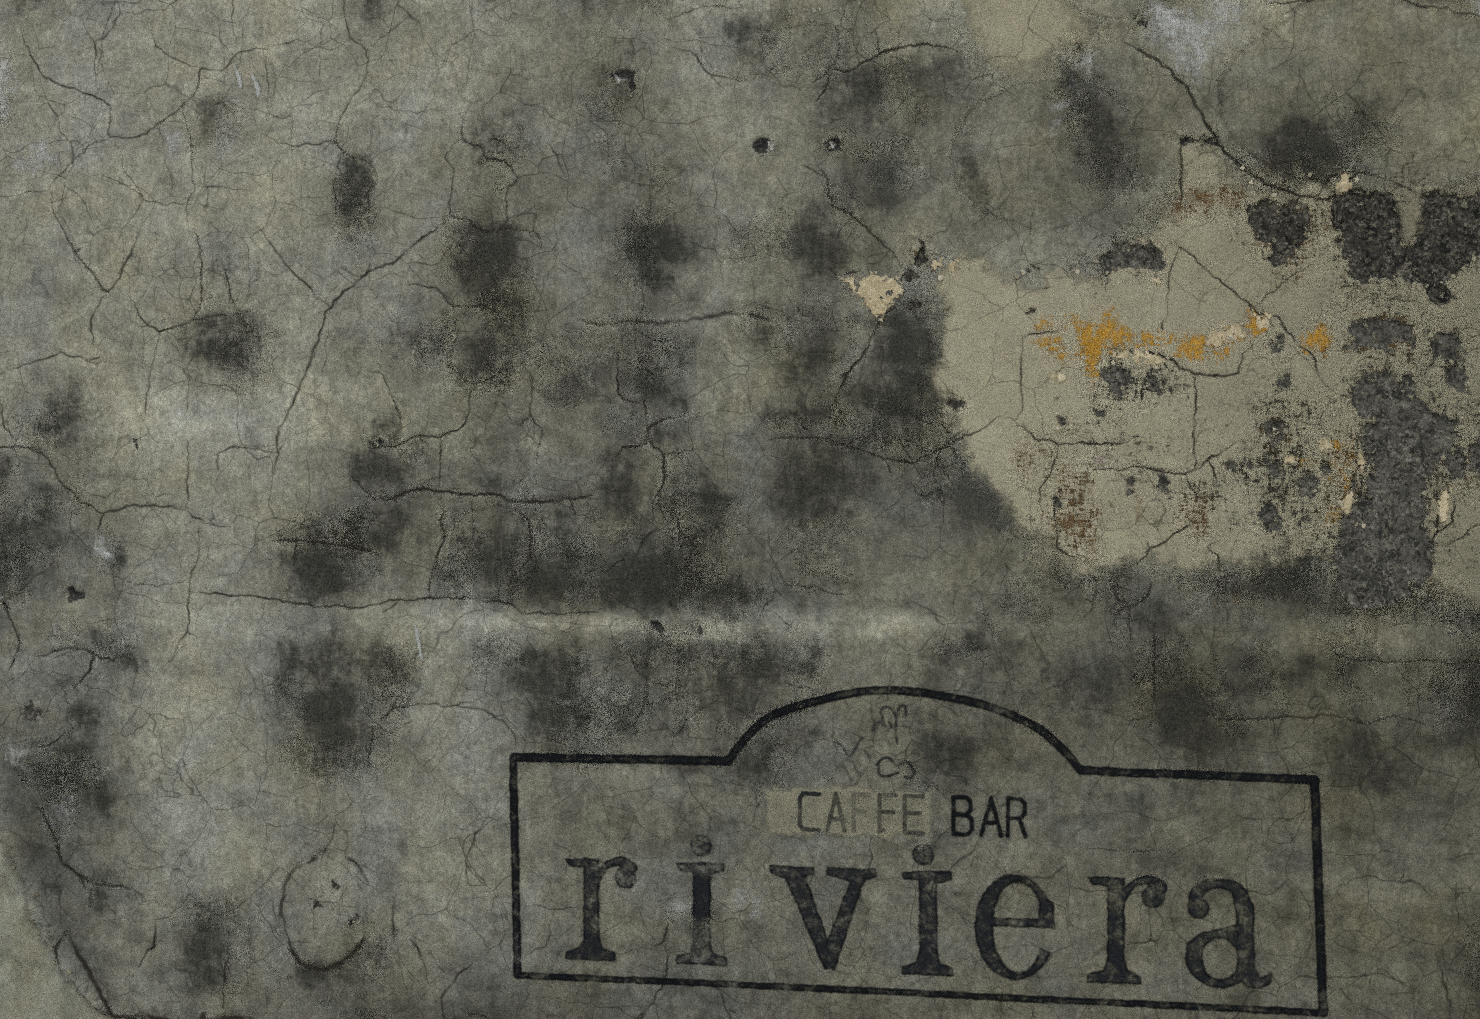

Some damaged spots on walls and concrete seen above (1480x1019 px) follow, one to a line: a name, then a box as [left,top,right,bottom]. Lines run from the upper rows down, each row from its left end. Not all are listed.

leakage [1148,0,1241,75]
crack [1135,47,1413,211]
leakage [193,313,257,367]
crack [0,138,517,530]
crack [182,373,591,638]
leakage [767,307,948,528]
rust [1031,307,1268,379]
peeling [838,134,1480,612]
crack [1018,248,1318,696]
rust [1300,322,1333,357]
leakage [278,634,408,775]
crack [54,940,245,1019]